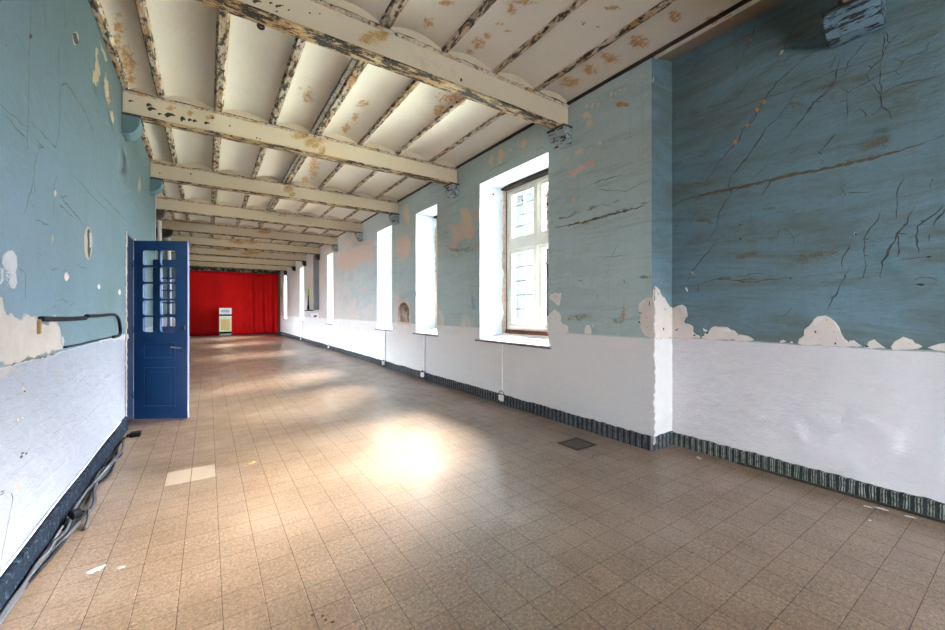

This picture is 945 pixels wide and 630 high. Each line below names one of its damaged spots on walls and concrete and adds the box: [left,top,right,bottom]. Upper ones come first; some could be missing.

peeling [146,103,215,125]
crack [678,28,942,291]
flaking render [0,250,17,289]
crack [828,178,945,308]
flaking render [0,297,64,395]
peeling [547,292,568,334]
peeling [639,286,754,342]
peeling [780,315,945,351]